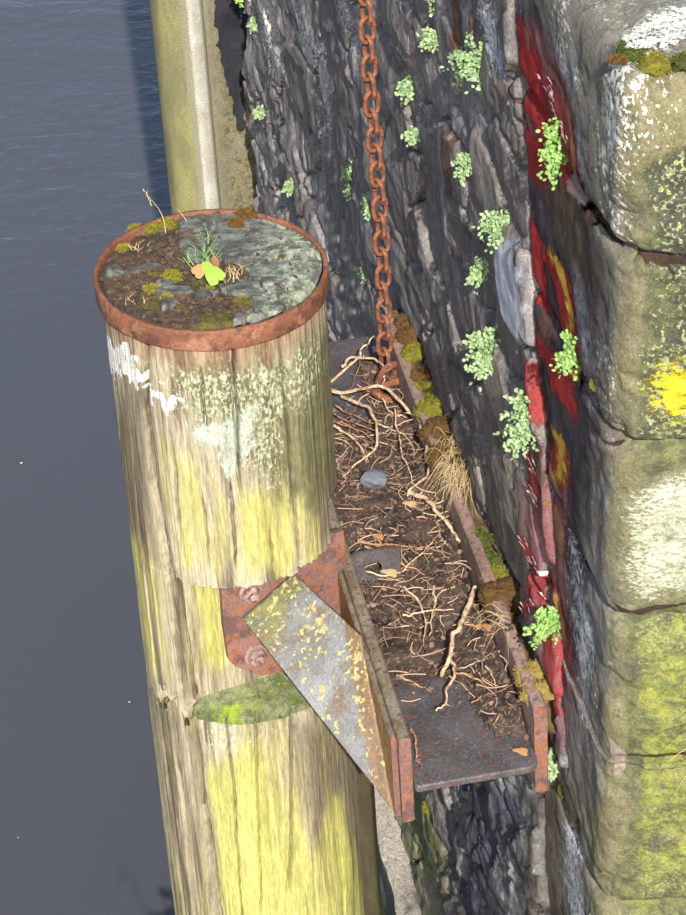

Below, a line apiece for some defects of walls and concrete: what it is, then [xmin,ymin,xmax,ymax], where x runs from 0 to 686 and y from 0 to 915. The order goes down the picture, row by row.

crack [625,750,686,758]